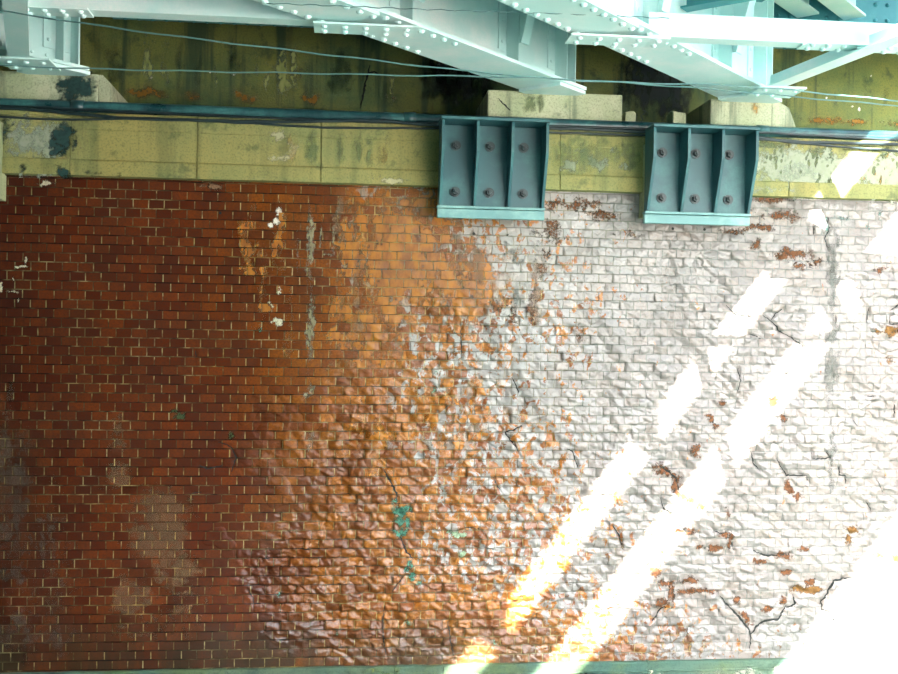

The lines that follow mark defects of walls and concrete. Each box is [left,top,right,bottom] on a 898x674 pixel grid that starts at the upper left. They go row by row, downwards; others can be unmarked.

spalling [533,197,616,279]
spalling [491,294,536,325]
water stain [128,486,202,613]
crack [720,594,796,648]
crack [820,577,863,622]